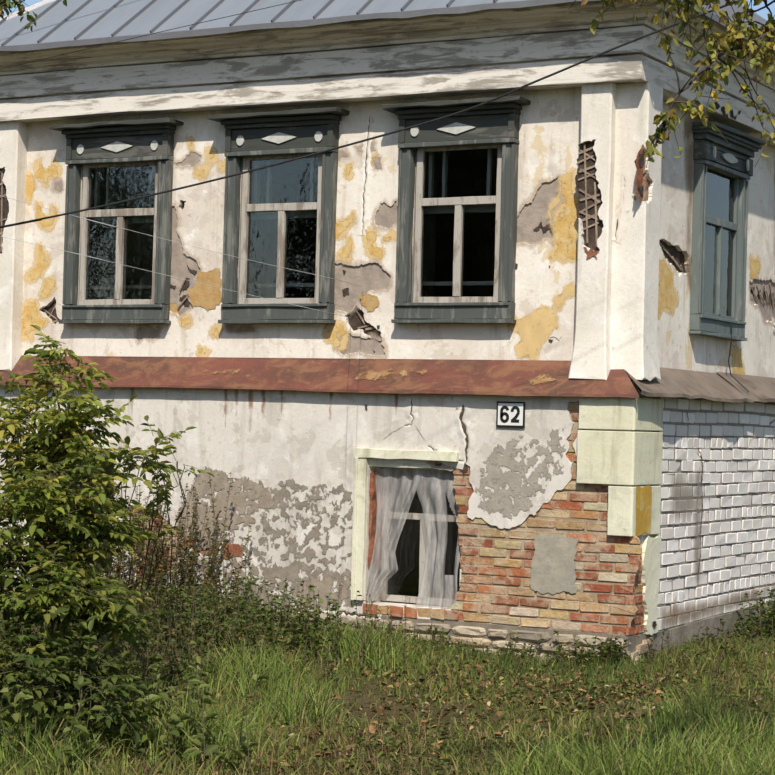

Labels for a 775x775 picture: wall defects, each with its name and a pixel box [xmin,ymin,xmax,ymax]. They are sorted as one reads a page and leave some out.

peeling [21,242,61,342]
flaking render [170,201,222,329]
flaking render [322,200,398,358]
crack [357,116,376,236]
flaking render [517,168,600,268]
flaking render [632,144,650,202]
flaking render [658,240,686,320]
rust [355,369,427,381]
rust [520,374,555,384]
crack [384,394,475,470]
flaking render [129,466,382,622]
flaking render [426,401,657,644]